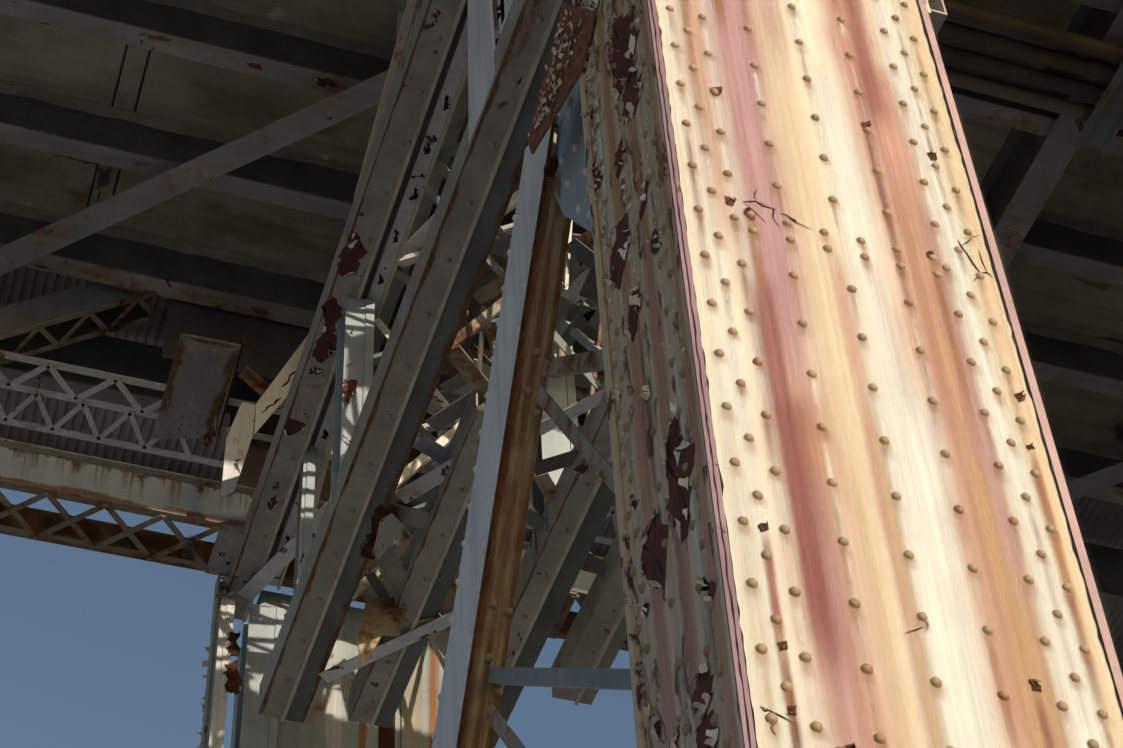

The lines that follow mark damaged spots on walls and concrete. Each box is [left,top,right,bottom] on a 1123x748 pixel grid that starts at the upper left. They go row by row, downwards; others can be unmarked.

rust [0,269,338,593]
peeling [308,295,343,375]
peeling [337,232,368,278]
rust [260,0,546,716]
peeling [528,0,665,361]
peeling [627,402,694,589]
peeling [724,195,756,220]
rust [712,0,887,748]
rust [832,0,1053,748]
rust [1034,464,1074,599]
rust [430,645,438,748]
peeling [691,661,719,748]